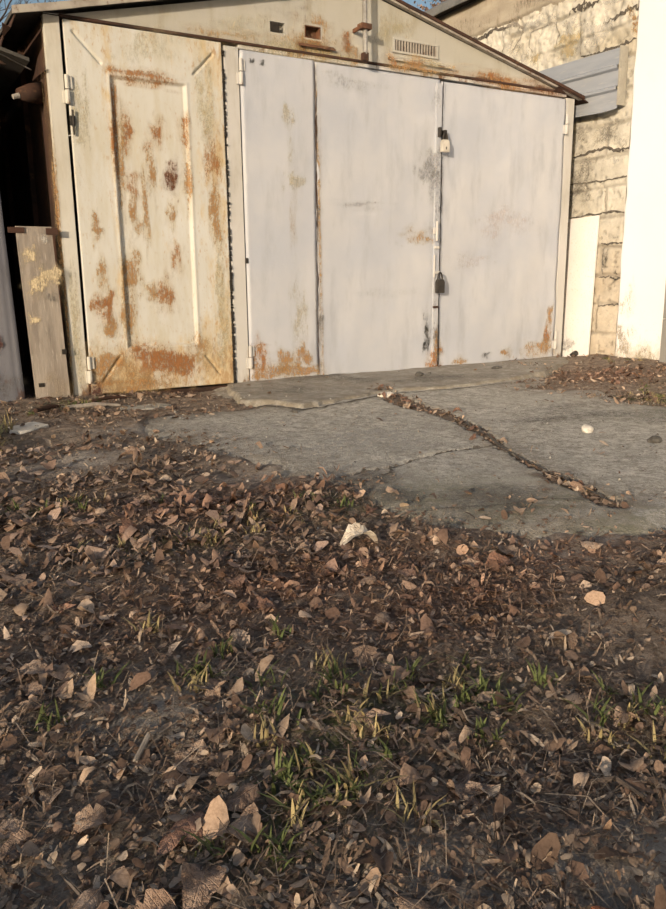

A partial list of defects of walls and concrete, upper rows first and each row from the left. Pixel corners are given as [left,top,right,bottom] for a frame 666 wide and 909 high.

corrosion [107,66,194,239]
peeling [23,236,62,293]
corrosion [88,251,210,394]
corrosion [205,68,237,383]
corrosion [249,336,324,380]
corrosion [525,307,553,355]
crack [255,382,625,509]